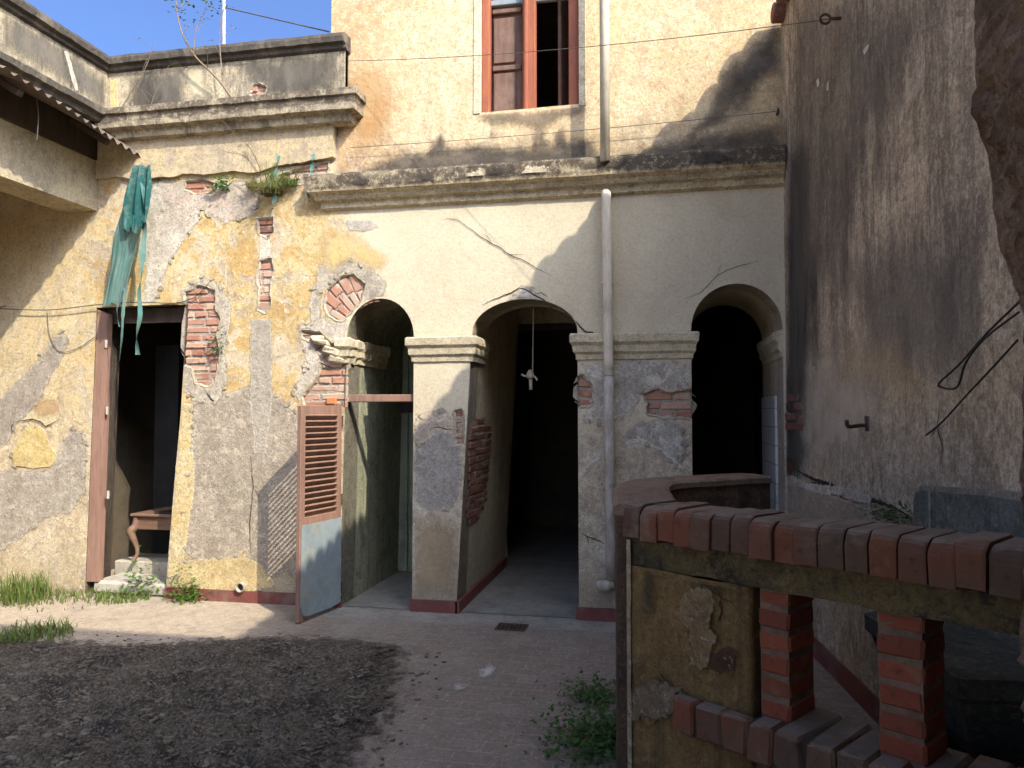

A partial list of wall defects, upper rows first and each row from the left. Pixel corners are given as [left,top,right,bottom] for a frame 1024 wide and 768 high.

peeling [144,177,275,302]
crack [448,217,594,333]
water stain [786,142,868,479]
flaking render [0,329,89,551]
flaking render [168,219,387,593]
flaking render [415,407,492,525]
flaking render [573,359,697,469]
flaking render [678,586,722,671]